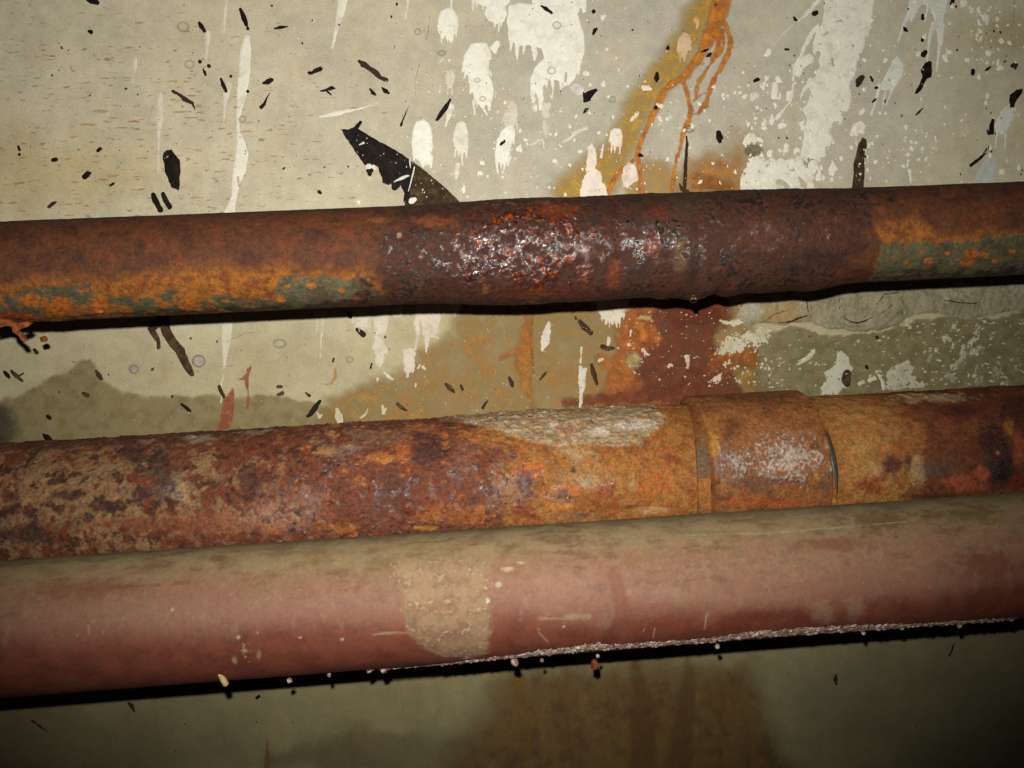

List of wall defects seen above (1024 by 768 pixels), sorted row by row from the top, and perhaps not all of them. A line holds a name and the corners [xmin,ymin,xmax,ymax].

rust [554,0,748,197]
rust [325,295,758,424]
spalling [735,275,1024,333]